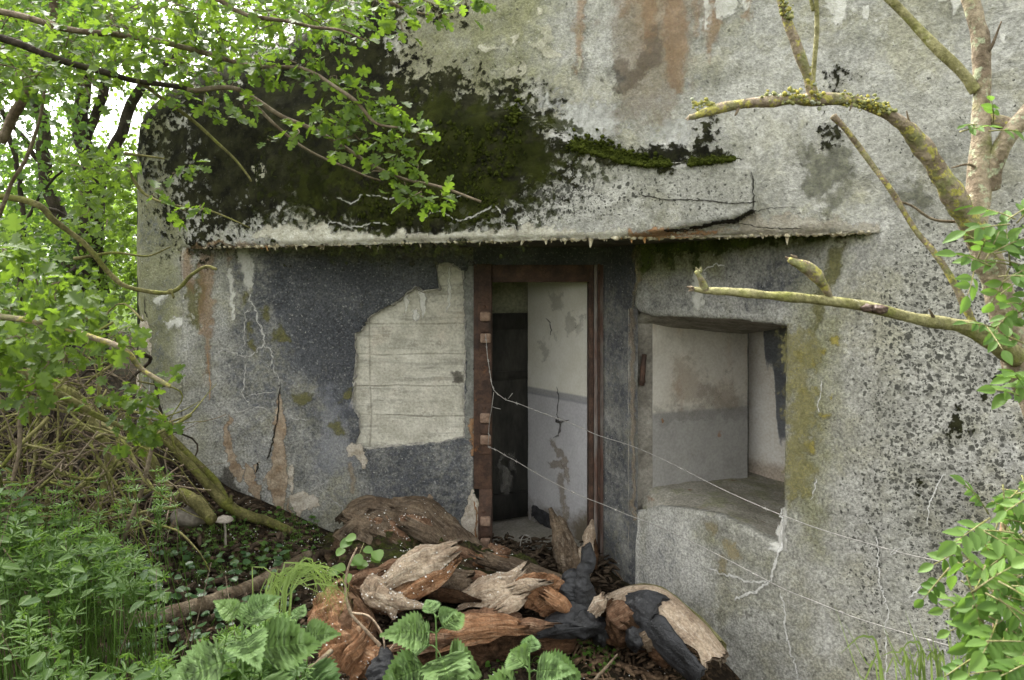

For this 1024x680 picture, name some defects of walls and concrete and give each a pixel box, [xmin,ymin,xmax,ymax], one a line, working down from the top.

corrosion [627,227,717,239]
crack [640,172,801,233]
crack [174,289,306,473]
peeling [346,263,474,469]
crack [555,389,569,437]
peeling [286,464,320,517]
crack [709,509,799,680]